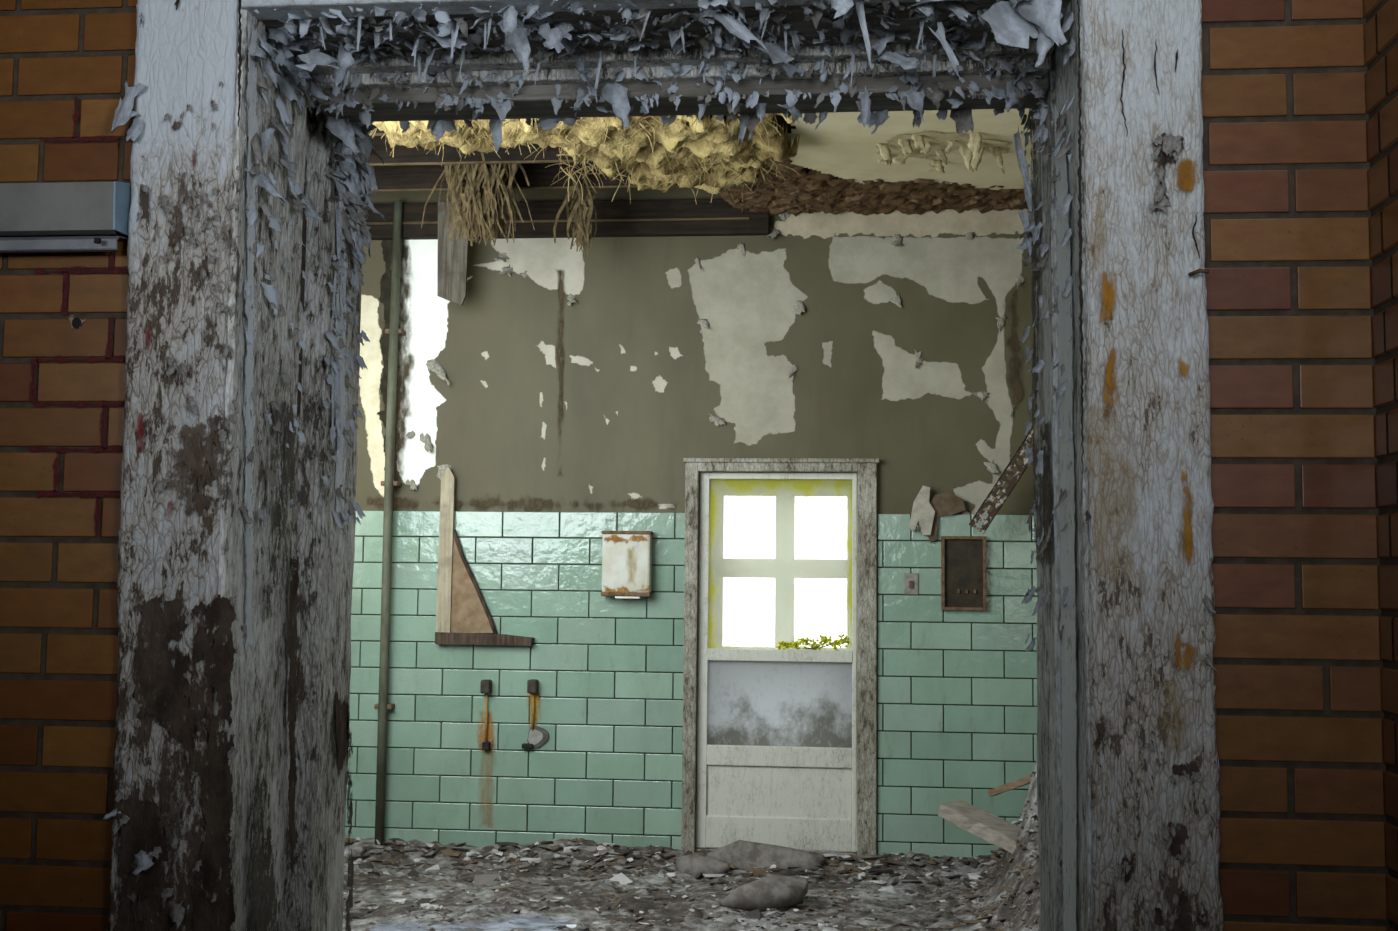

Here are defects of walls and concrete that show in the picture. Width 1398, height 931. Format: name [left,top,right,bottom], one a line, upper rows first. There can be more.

rust [1177,159,1196,191]
rust [1101,273,1116,321]
rust [1103,349,1117,417]
peeling [103,0,1091,931]
rust [1181,472,1193,561]
rust [601,531,653,597]
rust [1175,633,1196,670]